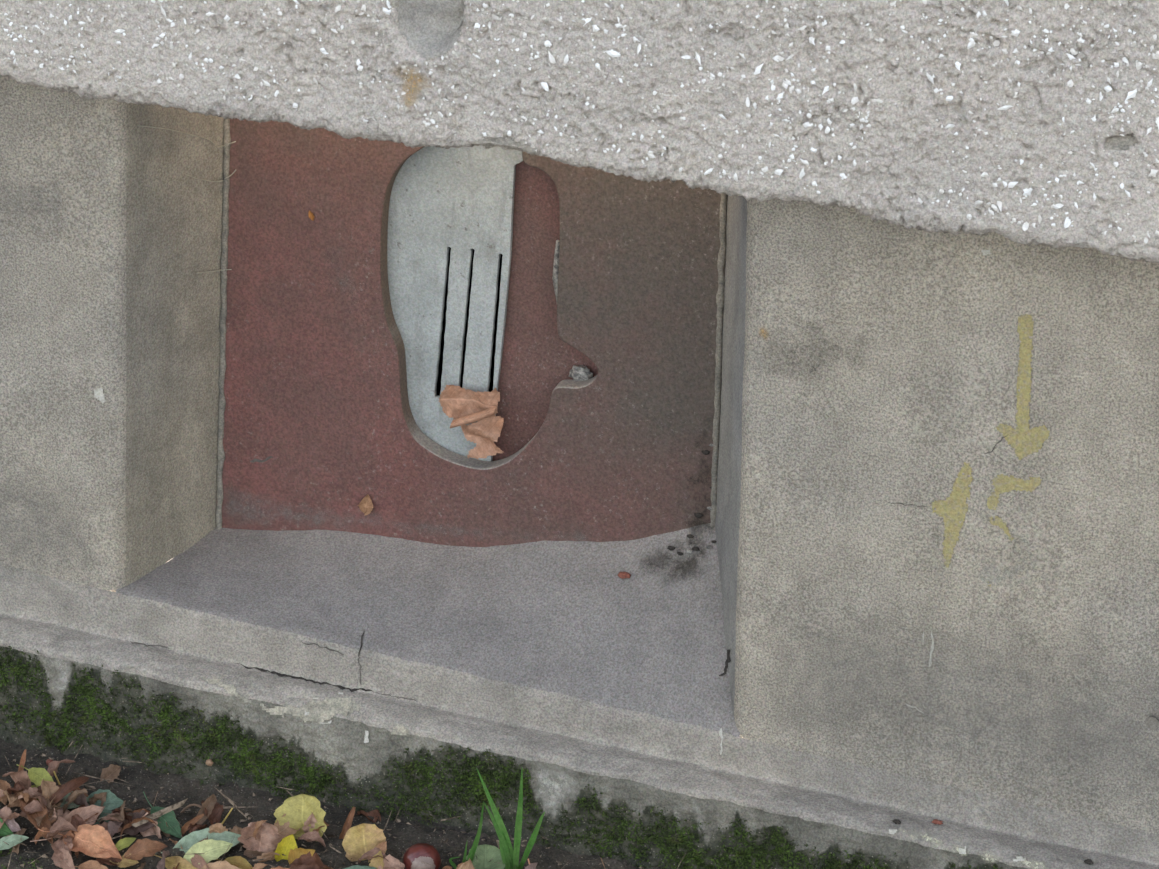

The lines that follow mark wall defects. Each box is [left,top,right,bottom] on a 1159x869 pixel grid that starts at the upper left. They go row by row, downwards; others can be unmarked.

spalling [2,0,287,101]
spalling [296,0,652,155]
spalling [594,0,897,194]
spalling [885,0,1159,243]
crack [235,632,417,702]